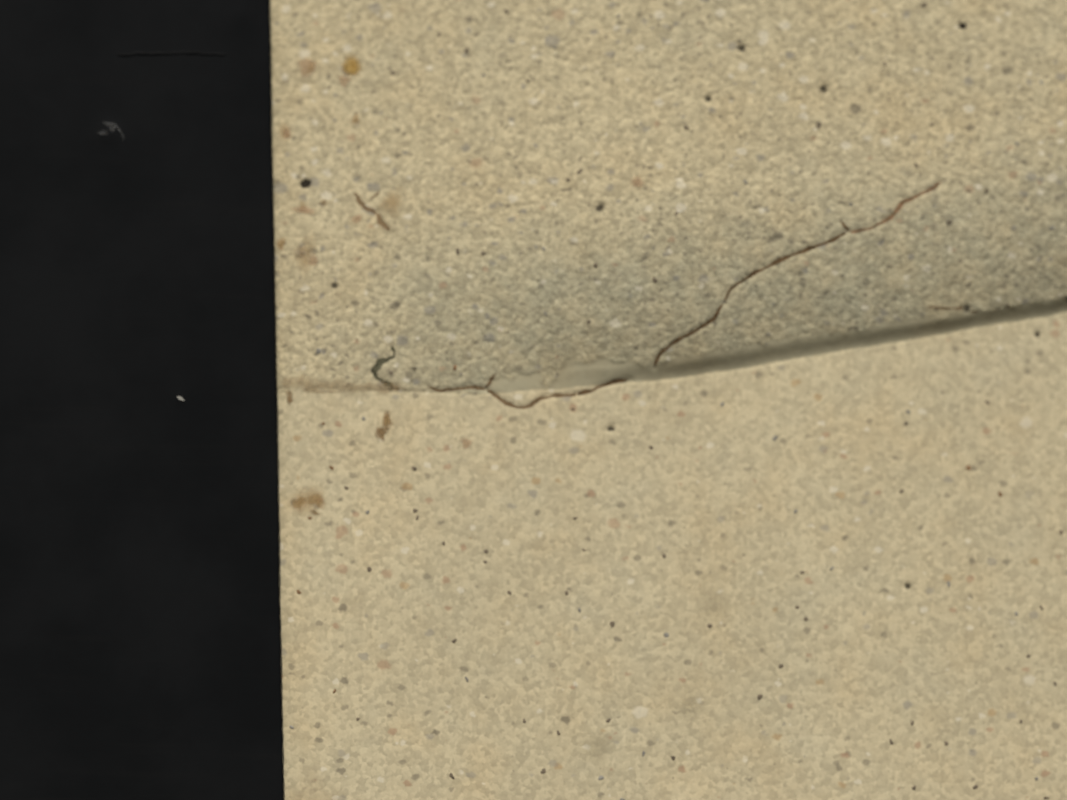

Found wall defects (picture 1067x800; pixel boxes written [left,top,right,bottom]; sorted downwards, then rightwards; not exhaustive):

crack [354,192,390,230]
crack [654,182,941,367]
crack [371,346,396,391]
crack [428,374,628,409]